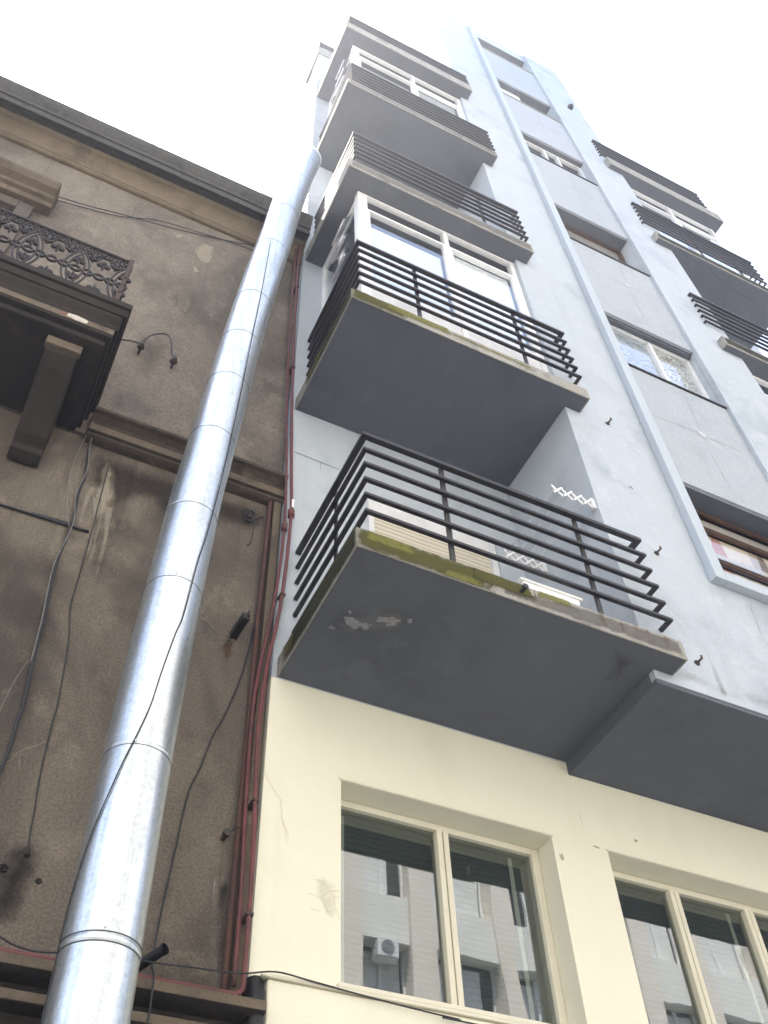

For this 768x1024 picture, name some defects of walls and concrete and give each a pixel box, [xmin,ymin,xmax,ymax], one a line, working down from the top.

water stain [79,462,173,573]
water stain [219,504,254,522]
peeling [328,610,412,631]